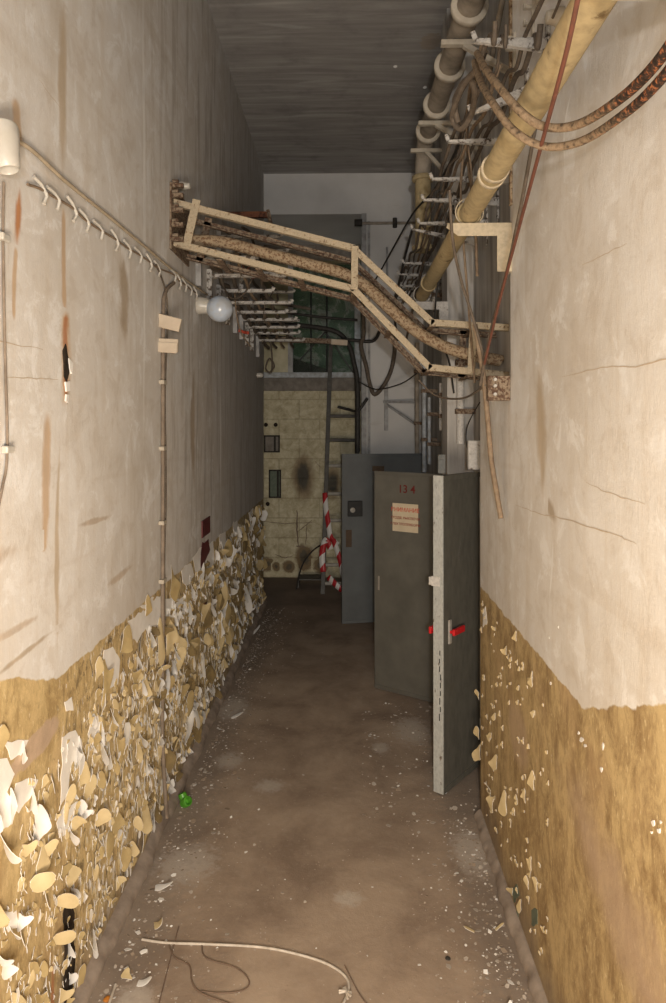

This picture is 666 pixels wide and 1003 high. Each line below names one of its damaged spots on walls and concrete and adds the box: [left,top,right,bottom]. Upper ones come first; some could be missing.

rust [39,203,75,680]
crack [563,358,666,377]
peeling [409,819,530,1003]